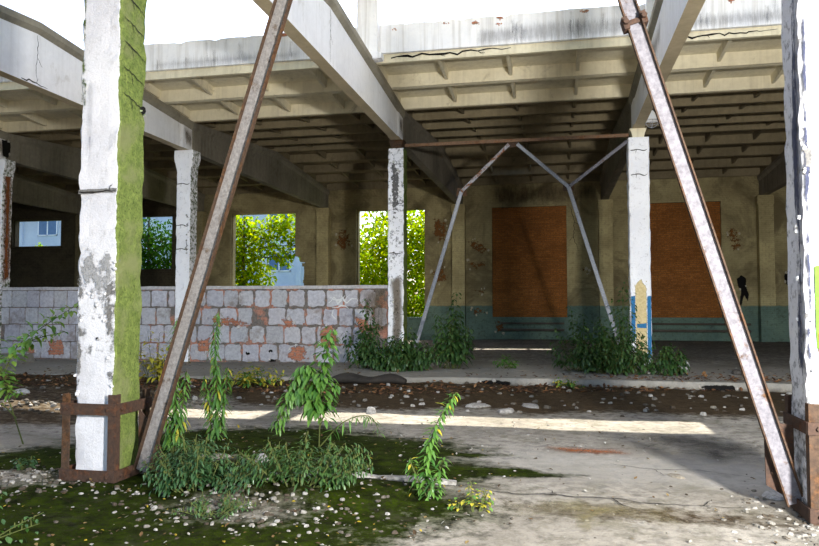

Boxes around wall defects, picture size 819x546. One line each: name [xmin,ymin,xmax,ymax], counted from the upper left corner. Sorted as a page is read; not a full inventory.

crack [391,47,511,59]
crack [688,29,775,39]
peeling [390,160,400,226]
corrosion [3,176,11,281]
peeling [77,250,117,340]
peeling [391,278,402,343]
peeling [74,312,82,396]
spalling [288,344,309,362]